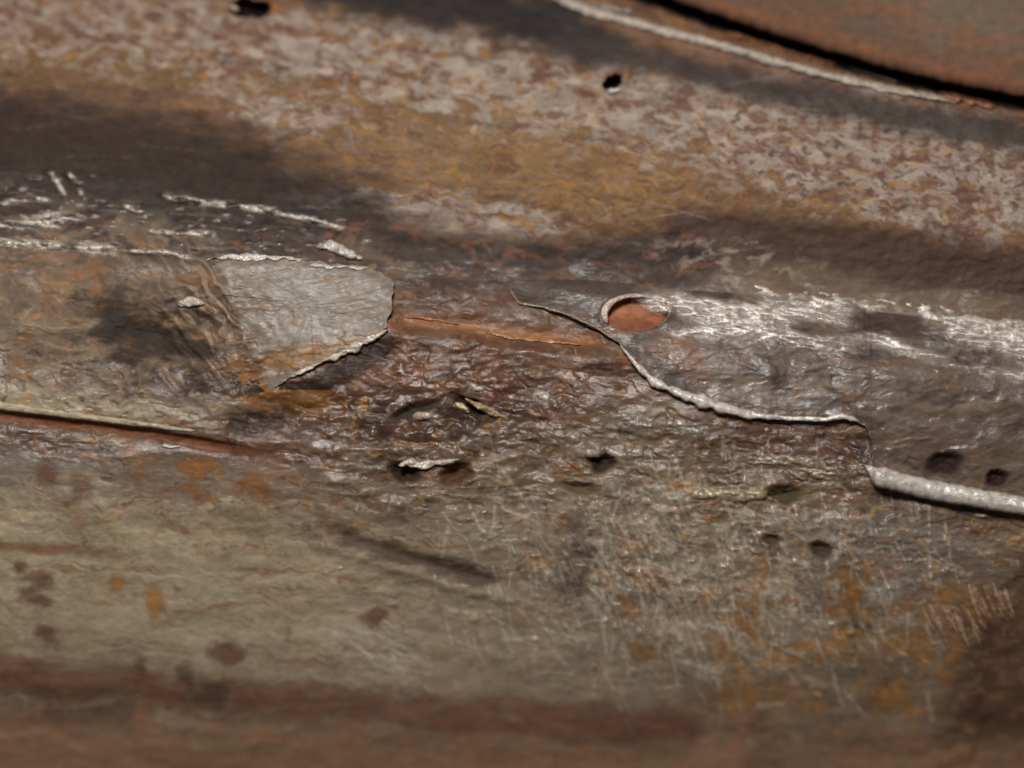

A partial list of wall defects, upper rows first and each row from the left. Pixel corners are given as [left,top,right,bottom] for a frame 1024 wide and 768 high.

peeling [205,252,394,390]
spalling [385,390,489,425]
spalling [555,454,620,498]
spalling [920,449,970,478]
spalling [984,467,1012,489]
spalling [762,481,812,509]
rust [23,572,50,605]
rust [366,610,385,624]
rust [210,643,240,662]